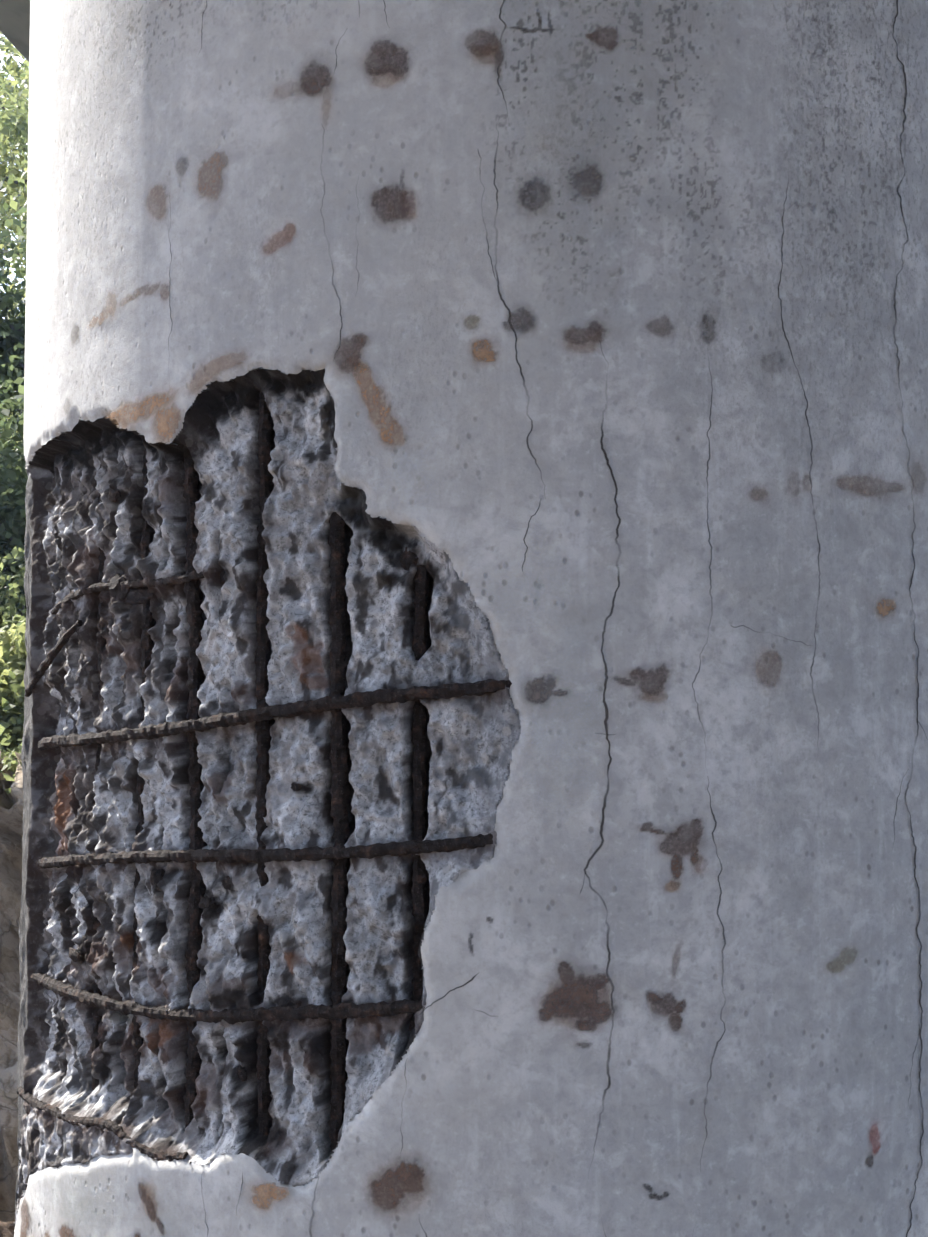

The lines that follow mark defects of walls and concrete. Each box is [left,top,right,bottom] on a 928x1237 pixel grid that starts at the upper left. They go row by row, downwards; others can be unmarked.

corrosion [365,40,408,75]
crack [893,0,908,244]
crack [487,242,525,383]
crack [600,426,621,540]
spalling [15,367,521,1225]
crack [580,575,620,1008]
corrosion [641,819,703,890]
corrosion [539,962,612,1031]
crack [894,783,924,1237]
corrosion [20,1202,29,1237]
corrosion [138,1183,163,1234]
corrosion [371,1161,425,1210]